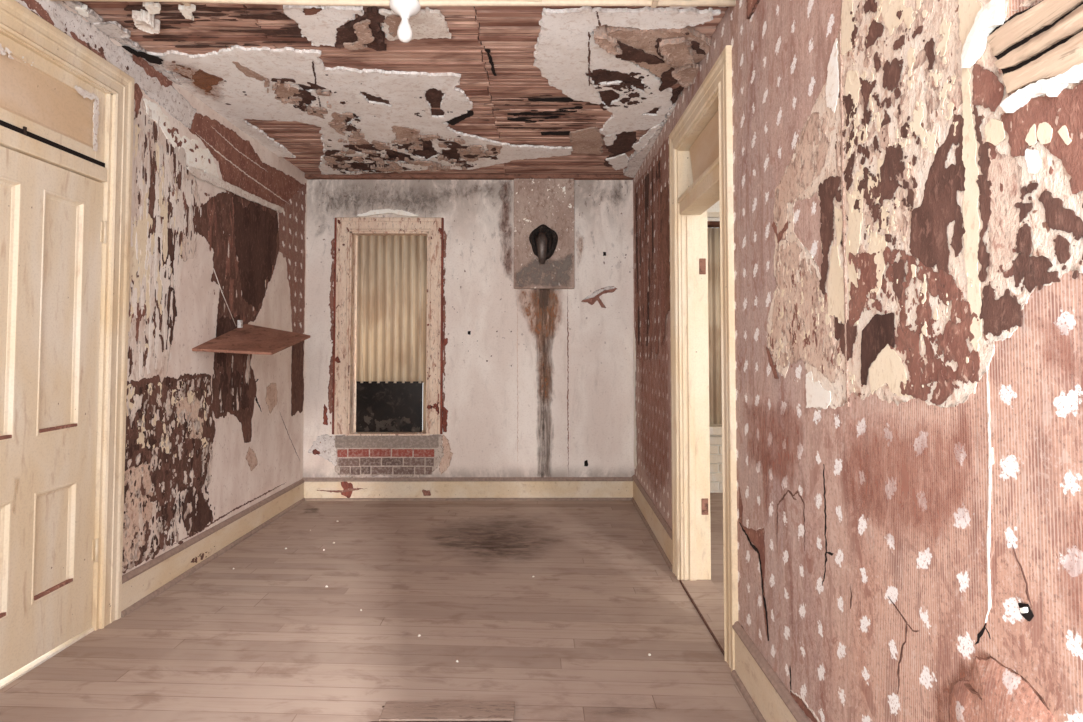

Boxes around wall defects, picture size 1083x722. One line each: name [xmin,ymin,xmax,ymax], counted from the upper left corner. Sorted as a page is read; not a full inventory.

peeling [15,0,721,213]
peeling [850,0,935,128]
flaking render [960,0,1083,113]
peeling [818,138,906,300]
peeling [950,205,966,257]
peeling [972,105,1083,336]
flaking render [308,228,453,498]
peeling [834,317,857,361]
peeling [124,378,213,569]
crack [777,464,833,584]
crack [1012,545,1032,610]
crack [888,597,918,694]